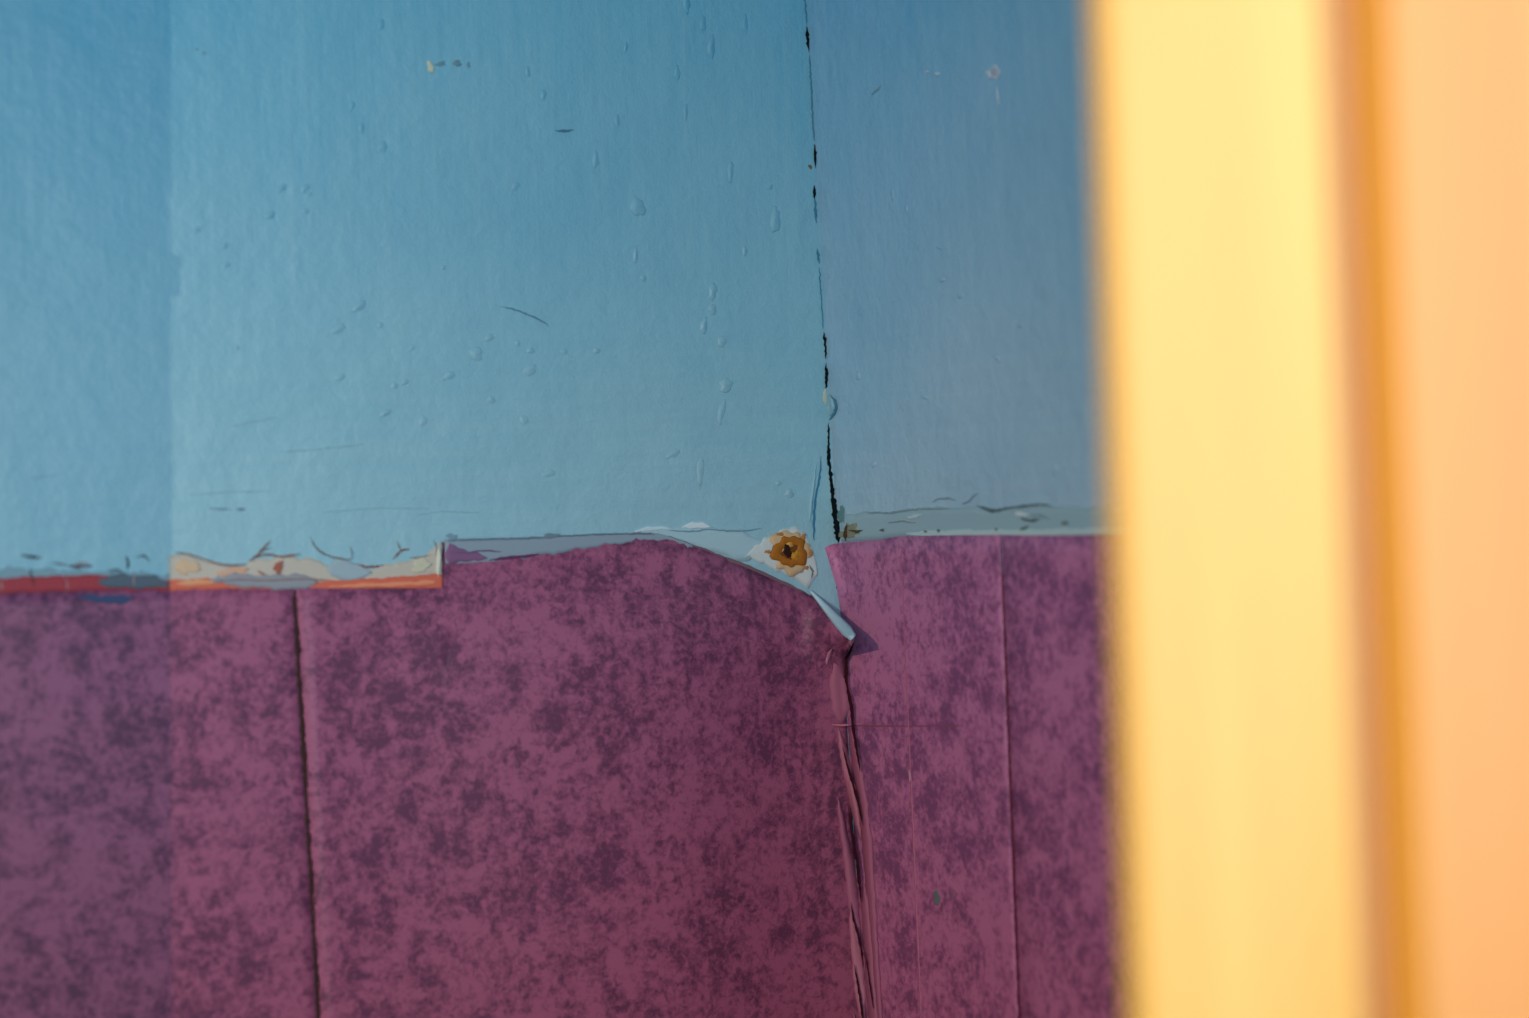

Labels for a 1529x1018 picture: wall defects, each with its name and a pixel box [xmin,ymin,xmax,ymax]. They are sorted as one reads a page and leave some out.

crack [804,0,1050,589]
flaking render [746,526,818,589]
rust [765,530,813,577]